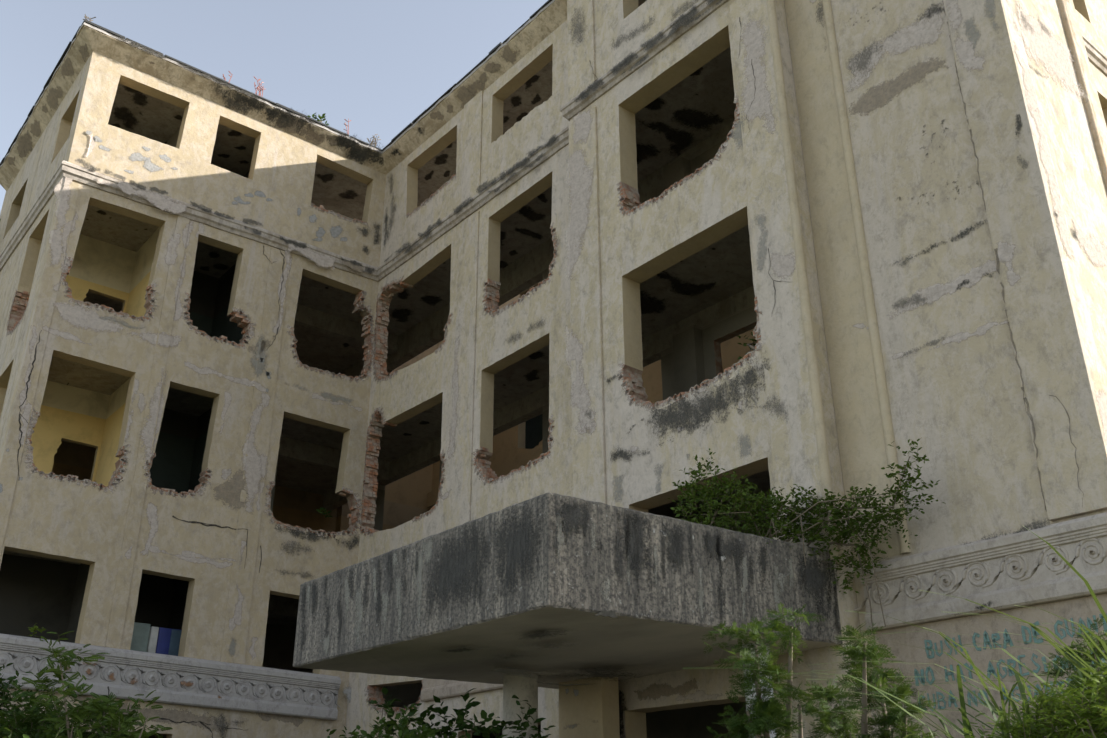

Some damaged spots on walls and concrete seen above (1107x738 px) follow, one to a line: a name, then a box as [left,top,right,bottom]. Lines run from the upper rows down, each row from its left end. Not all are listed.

spalling [97,141,188,214]
water stain [178,64,316,133]
water stain [325,134,401,165]
peeling [848,0,985,116]
crack [943,3,986,209]
peeling [49,177,442,383]
crack [17,330,42,478]
spalling [18,369,411,555]
water stain [611,359,786,460]
crack [994,248,1084,512]
crack [172,516,262,572]
water stain [276,501,840,654]